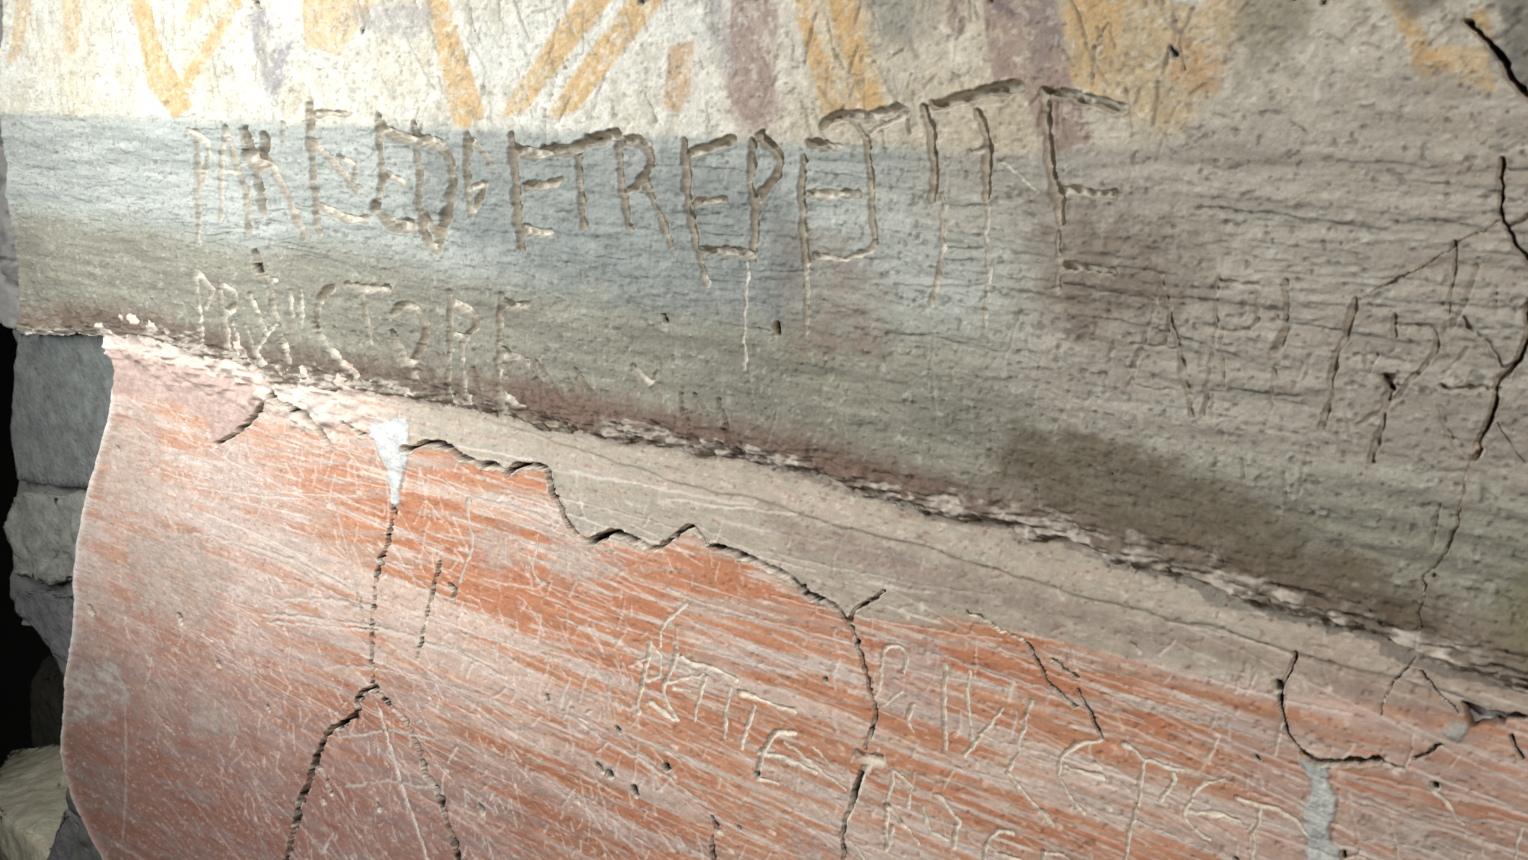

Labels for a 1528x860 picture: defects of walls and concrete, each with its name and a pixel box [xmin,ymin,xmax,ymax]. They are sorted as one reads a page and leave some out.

crack [1462,18,1528,100]
crack [1356,157,1528,316]
flaking render [604,419,811,474]
flaking render [870,482,1150,570]
crack [1276,301,1528,772]
crack [214,388,886,860]
flaking render [1210,569,1346,626]
flaking render [1366,615,1472,671]
spalling [1271,677,1287,695]
spalling [1470,711,1525,723]